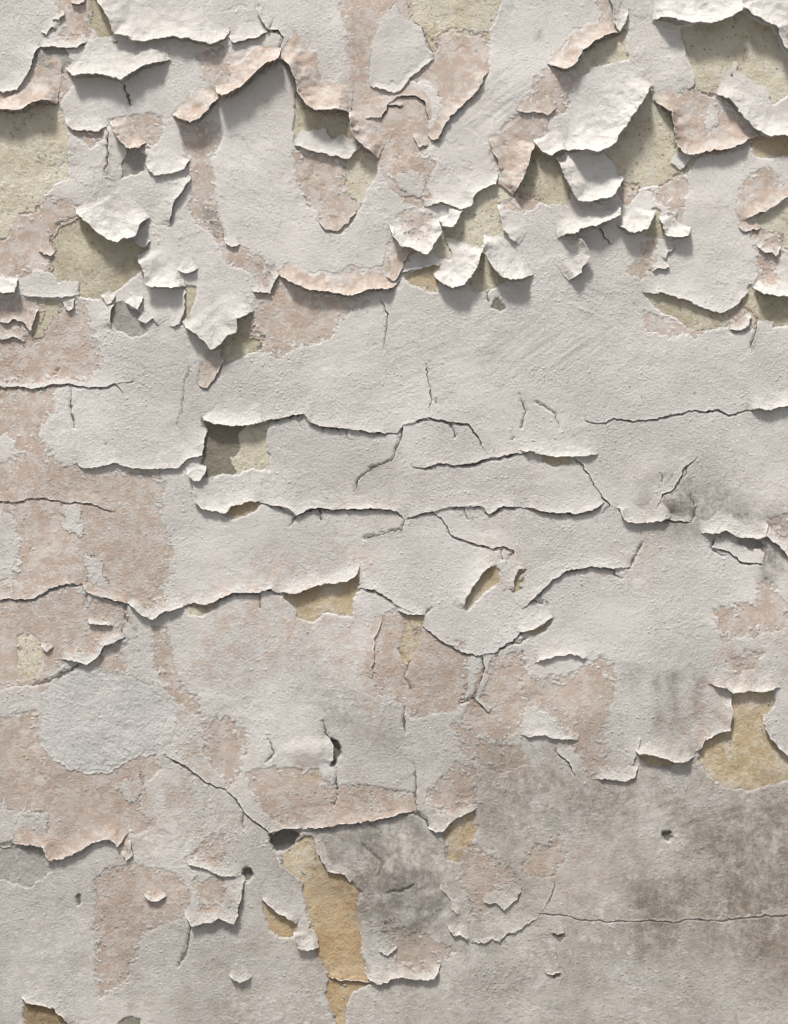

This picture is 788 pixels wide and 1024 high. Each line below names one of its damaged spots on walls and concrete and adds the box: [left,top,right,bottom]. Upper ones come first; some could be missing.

peeling [0,0,788,389]
crack [0,369,133,428]
crack [586,380,788,423]
crack [0,486,117,511]
crack [191,364,691,712]
crack [0,562,293,620]
peeling [0,384,788,1024]
crack [165,744,278,835]
crack [505,881,788,936]